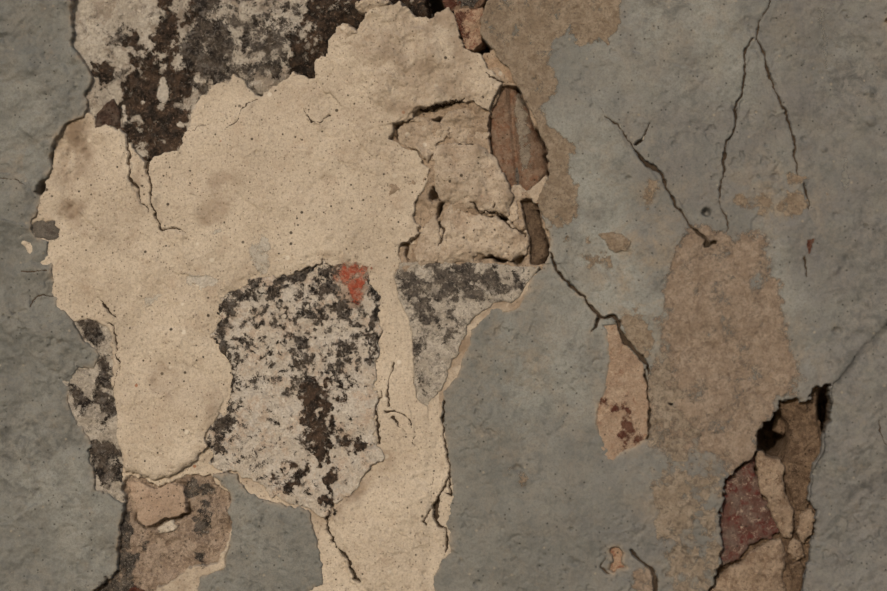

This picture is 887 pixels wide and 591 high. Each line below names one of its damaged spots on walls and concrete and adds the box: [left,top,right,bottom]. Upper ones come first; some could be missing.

crack [126,132,186,233]
flaking render [20,0,621,591]
crack [375,362,415,445]
crack [422,400,453,553]
crack [551,253,651,439]
flaking render [582,232,631,269]
crack [603,0,810,248]
peeling [597,222,830,591]